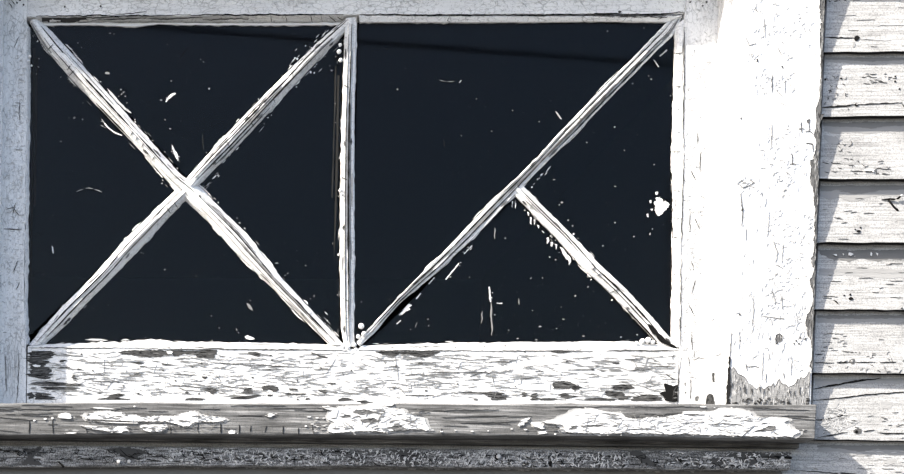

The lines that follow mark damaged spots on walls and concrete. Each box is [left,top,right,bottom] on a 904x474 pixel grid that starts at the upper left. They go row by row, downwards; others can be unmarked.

peeling [514,0,888,439]
peeling [377,346,439,364]
peeling [231,377,310,400]
peeling [457,383,507,401]
crack [87,415,217,433]
peeling [305,398,443,433]
crack [333,408,421,431]
crack [574,413,778,436]